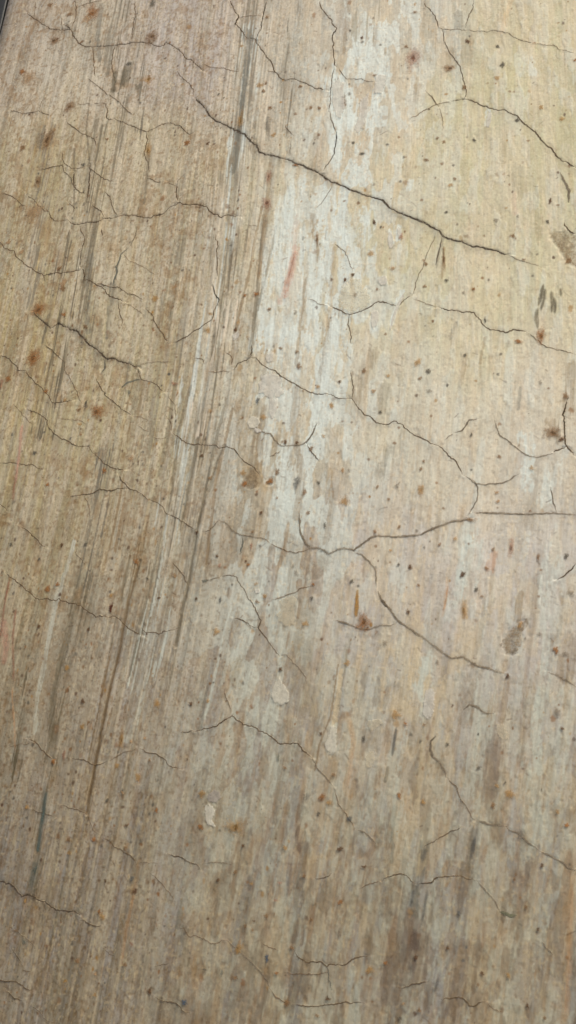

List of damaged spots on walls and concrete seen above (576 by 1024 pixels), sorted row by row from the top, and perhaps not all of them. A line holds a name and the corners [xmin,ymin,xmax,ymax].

crack [0,0,576,678]
crack [10,738,180,769]
crack [184,692,374,842]
crack [425,737,576,871]
crack [0,881,114,956]
crack [33,805,227,899]
crack [362,873,516,917]
crack [0,930,51,1022]
crack [181,928,368,1007]
crack [398,981,501,1012]